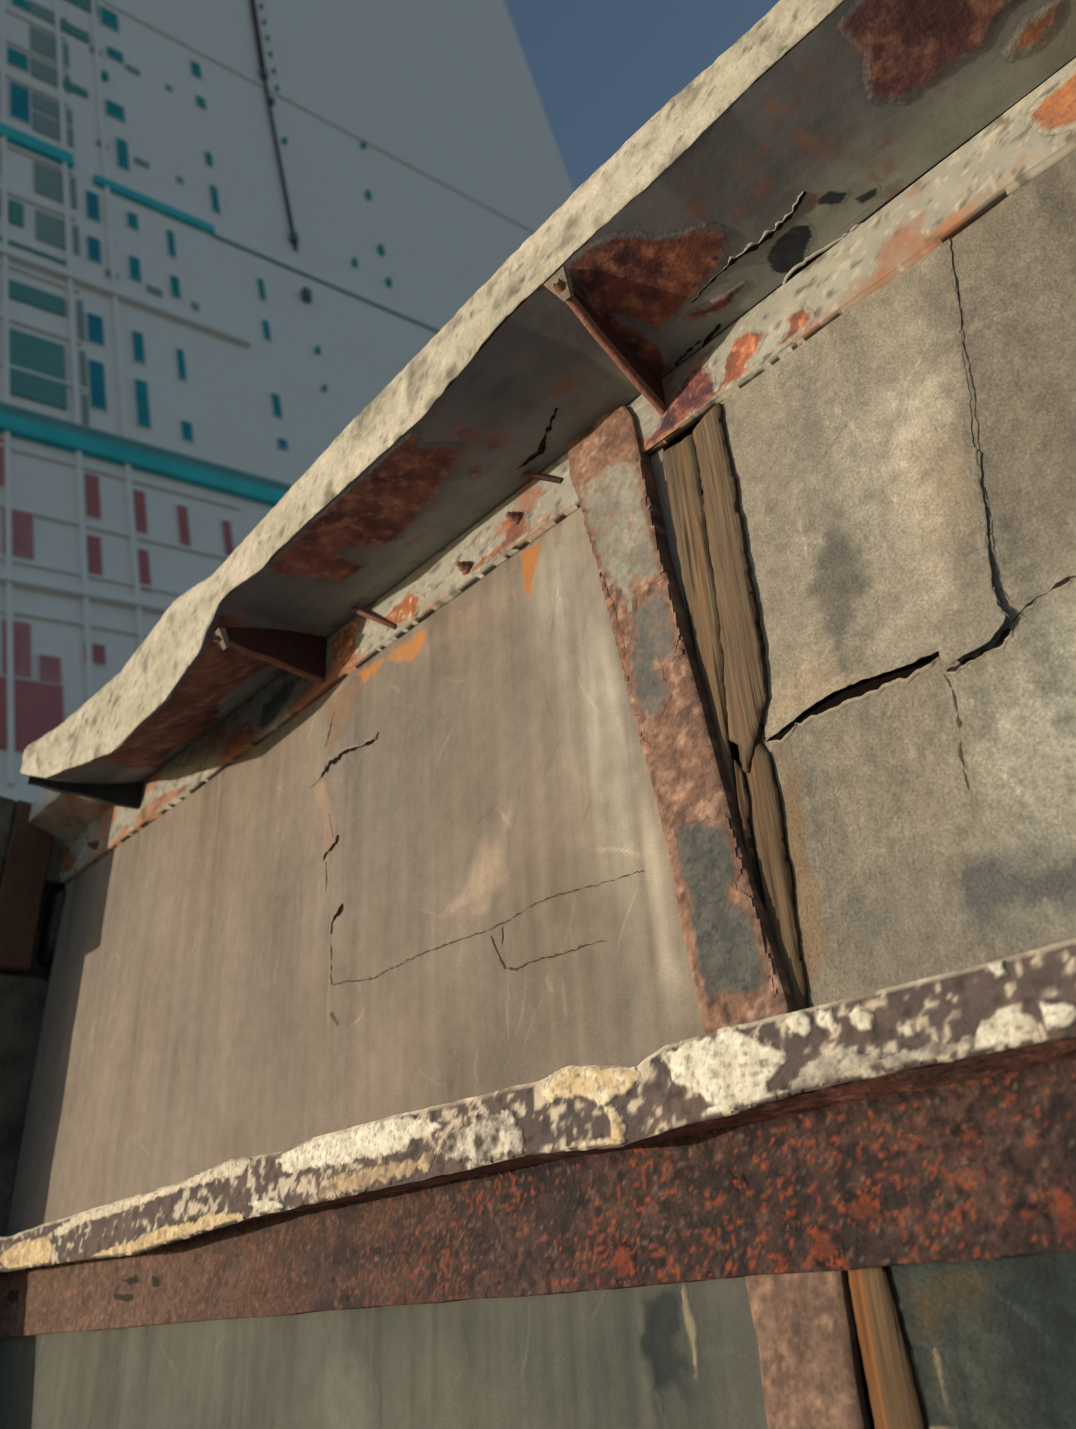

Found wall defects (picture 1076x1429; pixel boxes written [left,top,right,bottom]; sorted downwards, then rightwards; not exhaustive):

corrosion [834,0,1067,106]
corrosion [1021,71,1076,137]
corrosion [565,218,816,452]
crack [674,191,806,366]
crack [777,223,862,289]
corrosion [259,428,501,585]
crack [766,270,1076,789]
crack [311,712,644,985]
peeling [276,1107,525,1200]
peeling [0,1157,250,1270]
peeling [84,1197,284,1259]
peeling [681,1282,700,1384]